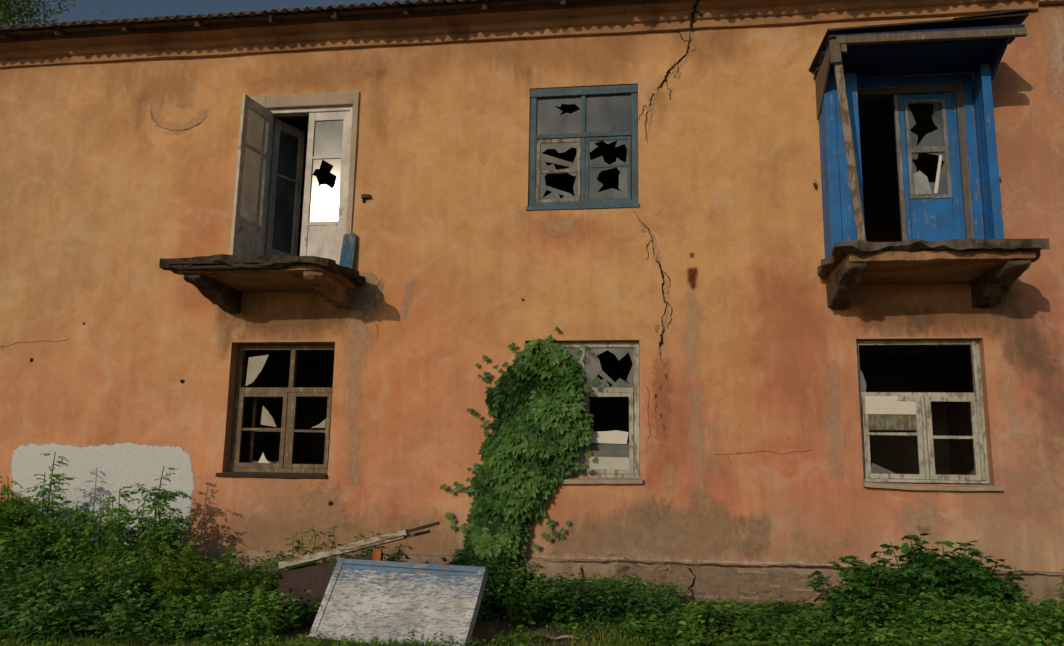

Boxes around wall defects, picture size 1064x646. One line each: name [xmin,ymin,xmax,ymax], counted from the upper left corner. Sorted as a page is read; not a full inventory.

crack [636,0,702,144]
crack [634,211,672,438]
rust [688,253,697,288]
peeling [737,569,826,603]